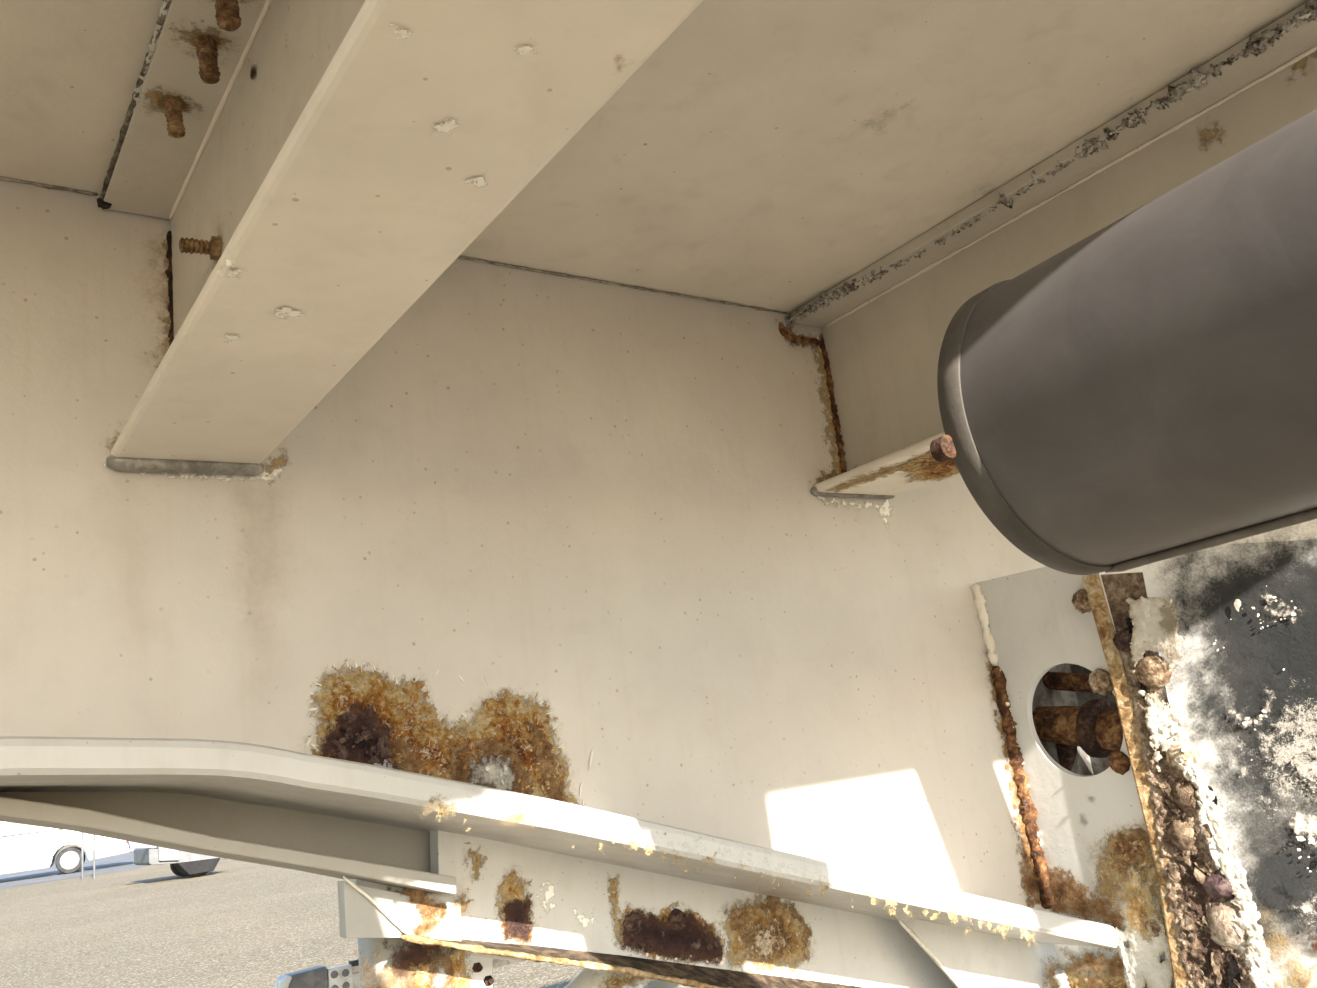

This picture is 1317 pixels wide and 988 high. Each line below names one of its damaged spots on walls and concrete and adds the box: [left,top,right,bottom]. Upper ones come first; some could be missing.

rust [145,91,199,112]
rust [826,448,959,493]
rust [305,660,585,823]
rust [429,795,487,880]
rust [599,832,717,873]
rust [986,617,1316,988]
rust [363,887,478,988]
rust [495,871,534,945]
rust [608,872,813,974]
rust [866,887,1036,946]